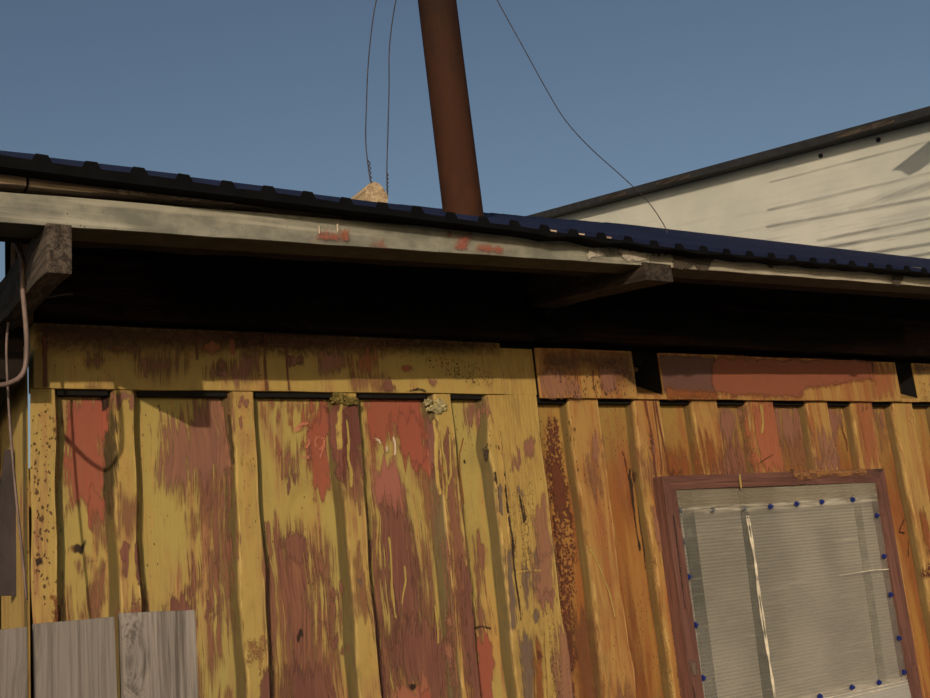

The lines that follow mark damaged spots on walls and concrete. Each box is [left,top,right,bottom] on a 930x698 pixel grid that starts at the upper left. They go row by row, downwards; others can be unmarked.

peeling [31,382,134,619]
peeling [117,483,148,614]
peeling [150,339,260,698]
peeling [245,511,350,698]
peeling [262,342,495,698]
peeling [512,436,536,471]
peeling [503,486,560,698]
corrosion [544,417,578,672]
peeling [552,622,575,698]
peeling [539,352,634,399]
peeling [659,354,896,488]